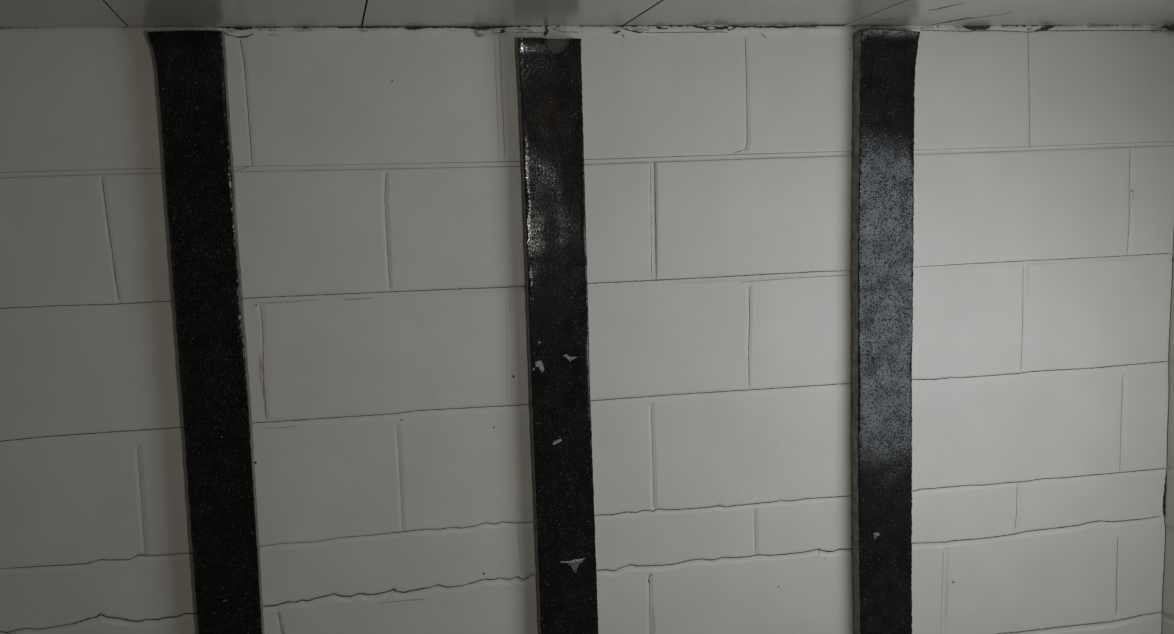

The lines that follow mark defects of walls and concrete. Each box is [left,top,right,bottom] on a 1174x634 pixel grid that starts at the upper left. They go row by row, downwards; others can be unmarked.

crack [920,3,1173,66]
crack [0,168,174,309]
crack [216,26,565,428]
crack [584,19,891,516]
crack [912,103,1174,634]
crack [0,427,192,569]
crack [0,613,197,634]
crack [260,442,536,634]
crack [598,534,851,603]